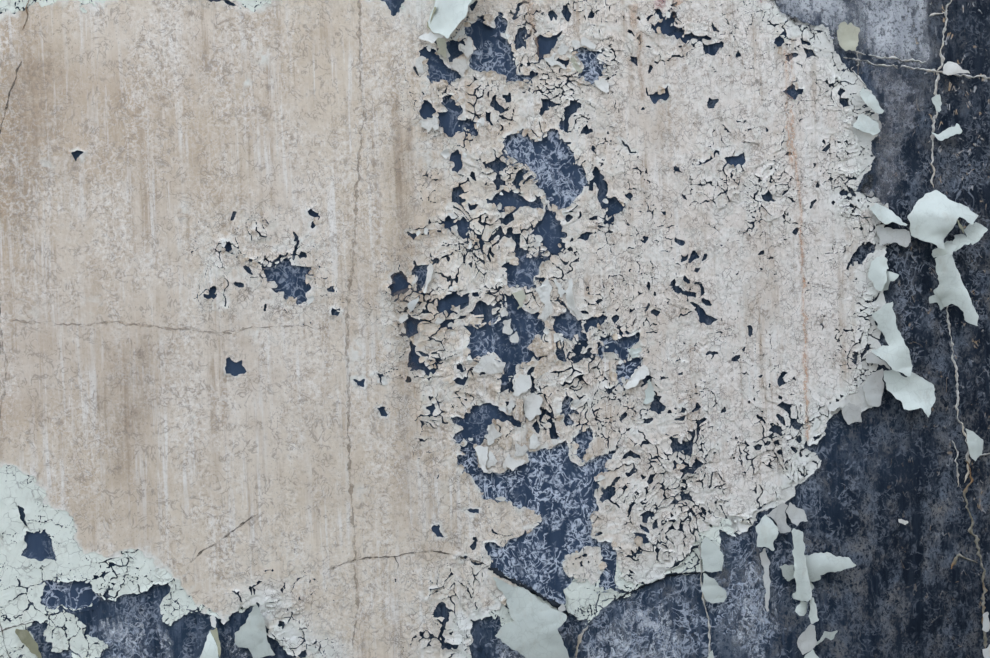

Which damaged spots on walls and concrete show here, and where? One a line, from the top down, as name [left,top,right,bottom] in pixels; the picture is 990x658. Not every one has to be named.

peeling [0,0,57,14]
crack [0,62,22,134]
crack [843,0,990,188]
peeling [308,209,321,228]
peeling [200,289,217,301]
peeling [216,239,337,305]
peeling [385,0,988,658]
peeling [225,357,246,380]
crack [946,306,990,649]
peeling [0,465,318,658]
crack [0,622,35,658]